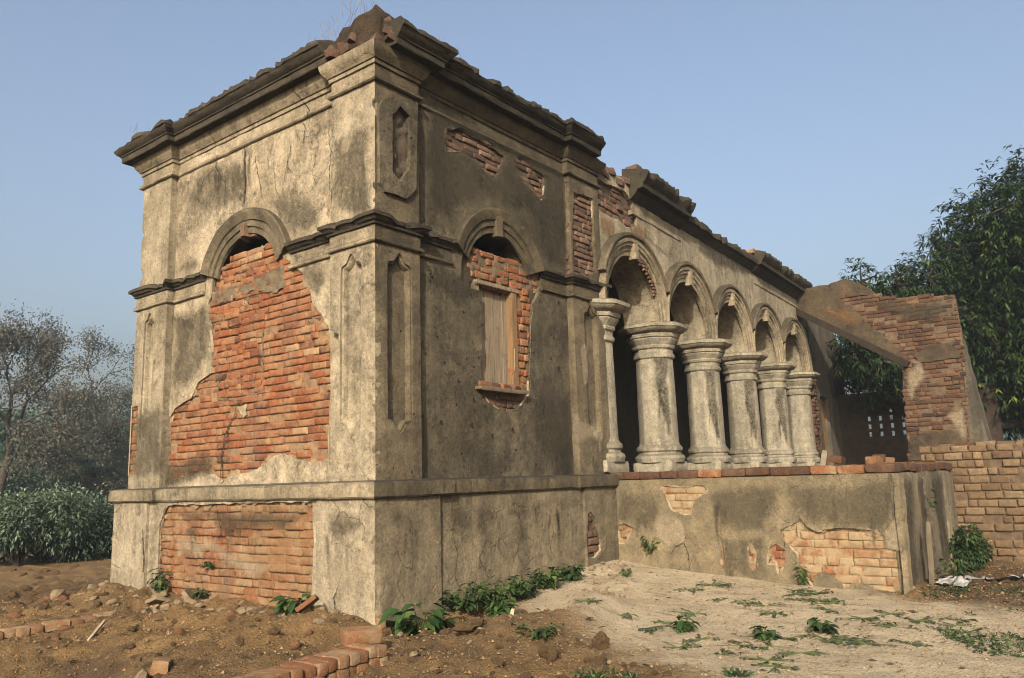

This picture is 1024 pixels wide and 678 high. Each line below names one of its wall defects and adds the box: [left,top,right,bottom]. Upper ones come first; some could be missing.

spalling [444,127,502,177]
spalling [514,158,545,201]
spalling [564,179,635,276]
spalling [169,233,331,483]
spalling [473,285,534,412]
spalling [660,478,708,516]
spalling [158,501,314,607]
spalling [587,512,601,558]
spalling [618,523,633,545]
spalling [746,520,900,592]